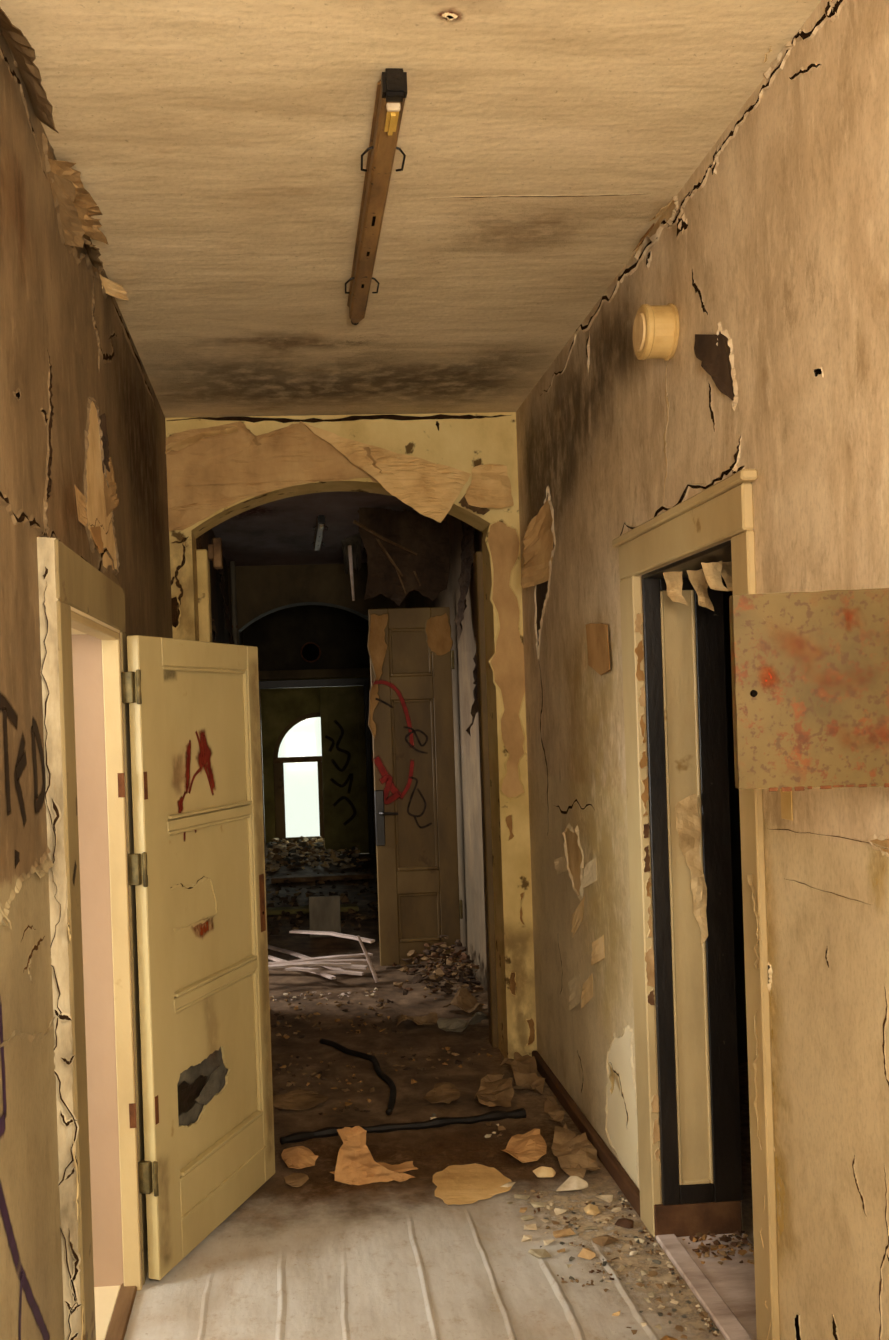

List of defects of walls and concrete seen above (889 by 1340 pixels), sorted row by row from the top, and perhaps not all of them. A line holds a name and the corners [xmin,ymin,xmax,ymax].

crack [438,192,642,200]
crack [540,0,848,396]
crack [91,272,512,431]
spalling [75,397,120,575]
peeling [485,520,526,841]
crack [0,349,120,1340]
crack [830,1314,842,1340]
crack [852,1155,889,1340]